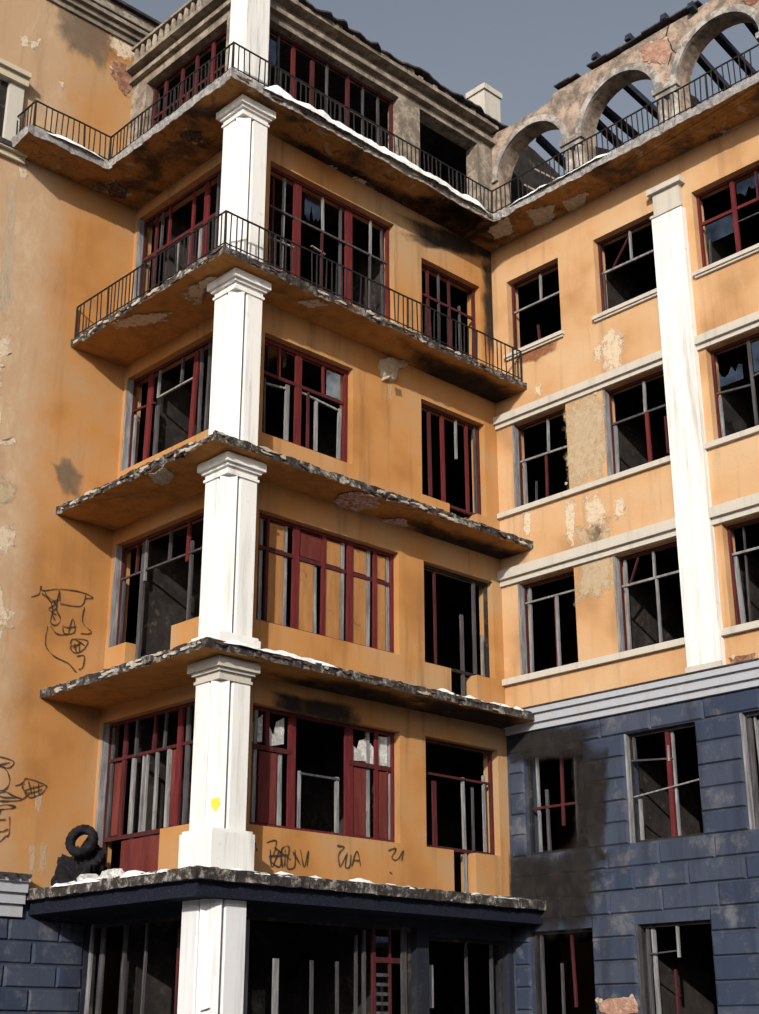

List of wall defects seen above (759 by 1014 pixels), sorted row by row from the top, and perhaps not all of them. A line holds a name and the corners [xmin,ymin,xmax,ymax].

peeling [73,246,224,345]
spalling [366,310,427,343]
peeling [593,327,625,371]
spalling [250,446,286,460]
peeling [564,391,606,486]
water stain [57,461,79,494]
peeling [0,524,15,553]
spalling [333,480,454,527]
peeling [564,492,626,547]
peeling [576,556,613,599]
peeling [0,586,15,639]
spalling [595,994,638,1014]